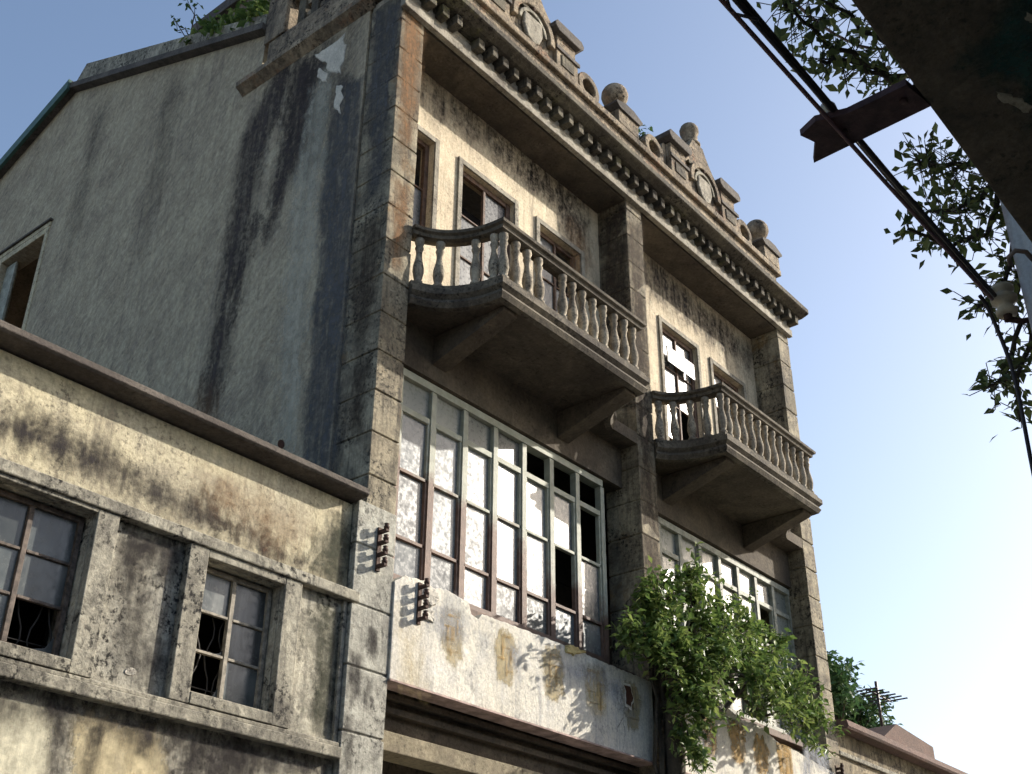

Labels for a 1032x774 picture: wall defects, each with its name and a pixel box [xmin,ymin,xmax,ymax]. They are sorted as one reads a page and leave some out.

peeling [315,32,347,114]
leakage [954,0,1032,128]
peeling [996,91,1032,113]
leakage [199,0,401,470]
leakage [421,70,589,274]
leakage [598,208,752,590]
leakage [0,413,352,583]
spalling [425,586,439,623]
leakage [0,688,326,774]
spalling [622,682,634,710]